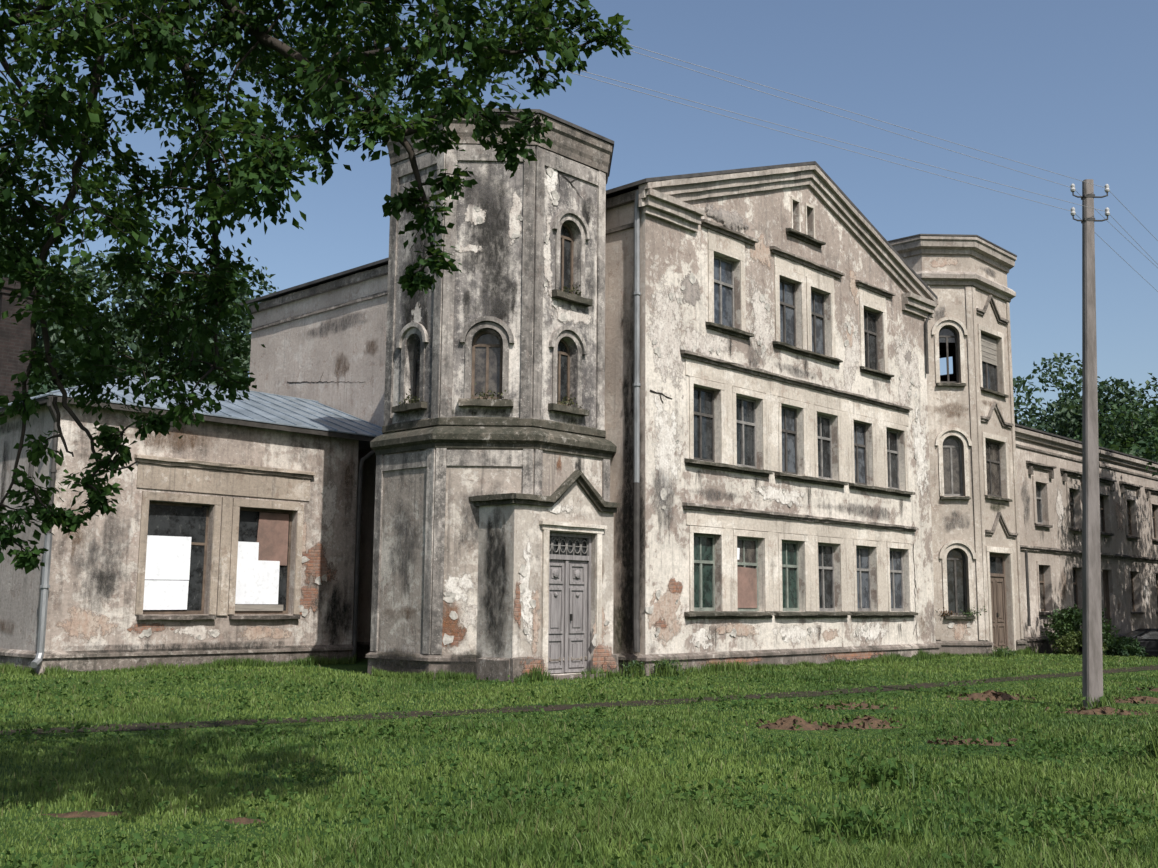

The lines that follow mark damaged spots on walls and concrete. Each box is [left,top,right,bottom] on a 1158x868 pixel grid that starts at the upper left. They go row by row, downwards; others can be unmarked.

flaking render [464,204,487,225]
damp [463,173,516,331]
damp [615,297,673,648]
damp [313,573,350,645]
damp [392,510,416,586]
flaking render [443,572,478,645]
damp [449,653,481,675]
damp [459,493,507,652]
flaking render [645,588,839,649]
flaking render [853,621,887,641]